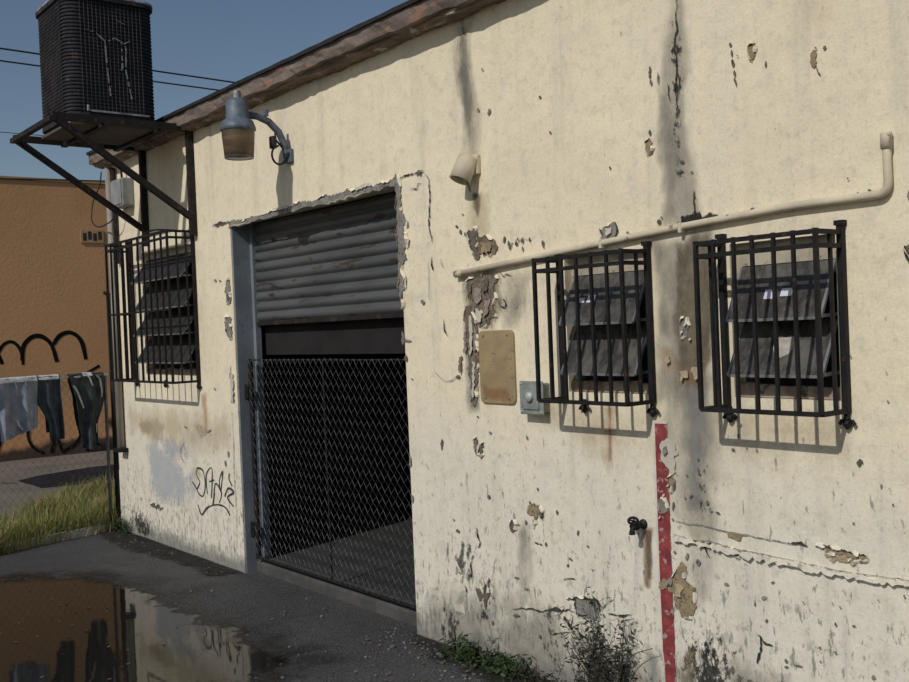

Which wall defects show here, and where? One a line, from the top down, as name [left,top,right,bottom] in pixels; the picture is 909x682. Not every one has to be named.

water stain [458,58,473,135]
crack [667,2,680,111]
water stain [667,21,718,223]
spalling [228,173,409,309]
crack [400,170,443,291]
spalling [455,225,530,260]
peeling [458,273,499,418]
water stain [435,541,564,670]
crack [515,606,575,614]
rust [643,530,651,587]
spalling [658,551,700,620]
water stain [681,626,747,682]